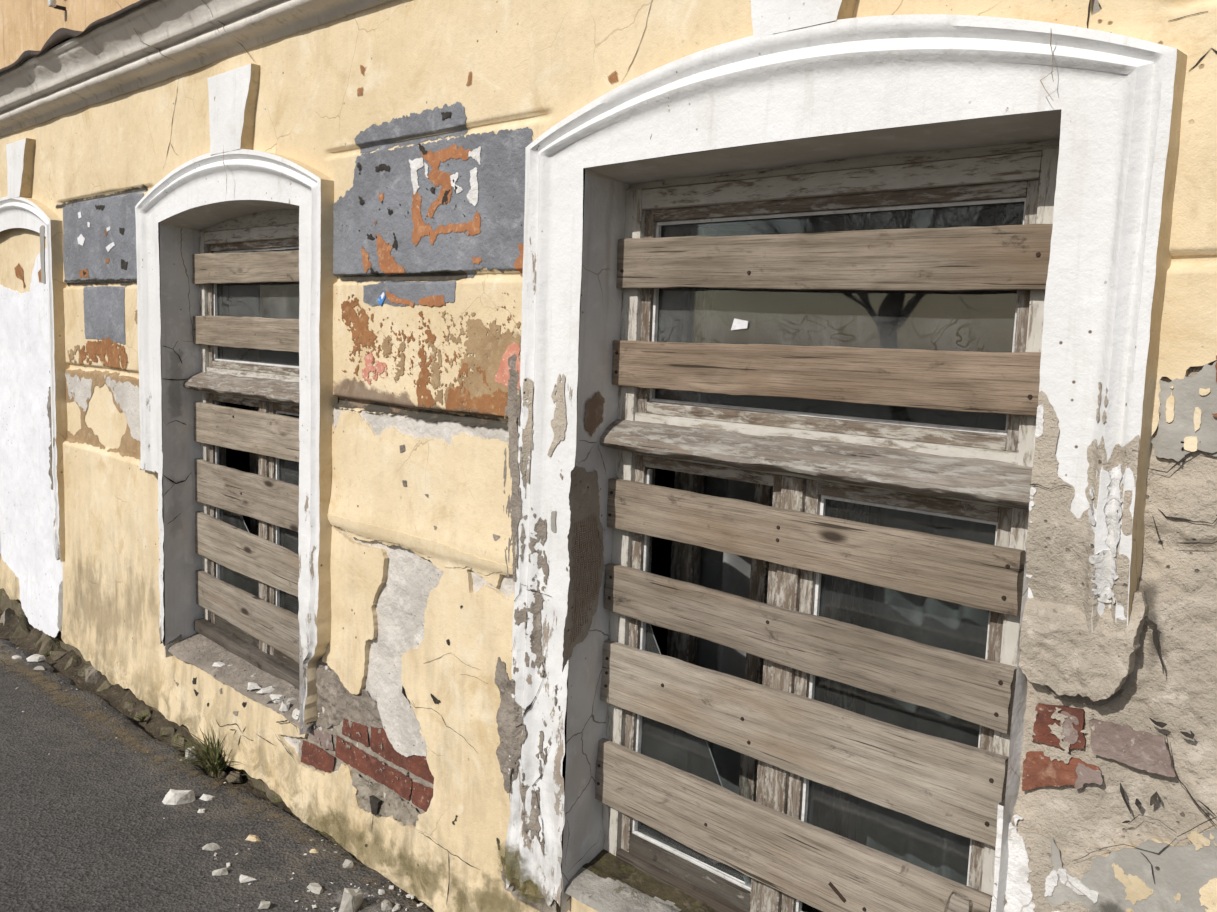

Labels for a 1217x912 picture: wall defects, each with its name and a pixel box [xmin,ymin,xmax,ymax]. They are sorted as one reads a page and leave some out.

peeling [14,263,42,288]
peeling [345,143,481,276]
peeling [513,243,524,276]
peeling [47,337,141,490]
flaking render [233,527,444,827]
peeling [333,291,604,856]
flaking render [991,355,1217,912]
crack [1153,509,1217,544]
flaking render [501,869,557,912]